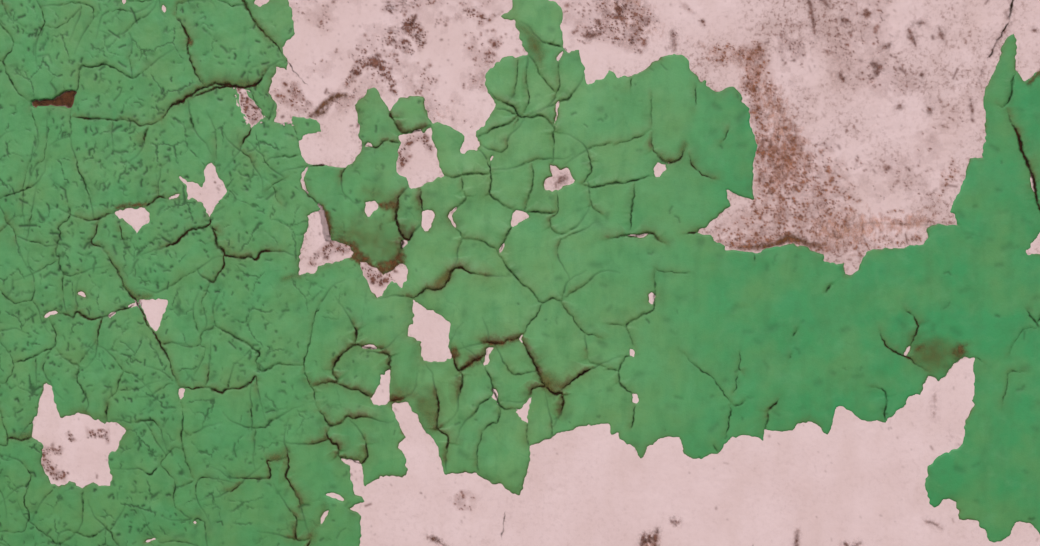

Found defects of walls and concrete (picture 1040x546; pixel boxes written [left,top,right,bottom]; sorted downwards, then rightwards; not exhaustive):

peeling [169,163,227,217]
crack [136,20,268,165]
peeling [233,0,528,194]
peeling [549,0,1040,275]
rust [706,41,931,256]
crack [1014,127,1040,210]
peeling [32,383,126,488]
crack [18,213,271,428]
crack [303,327,398,463]
peeling [408,300,452,362]
crack [436,297,590,448]
peeling [326,357,1040,546]